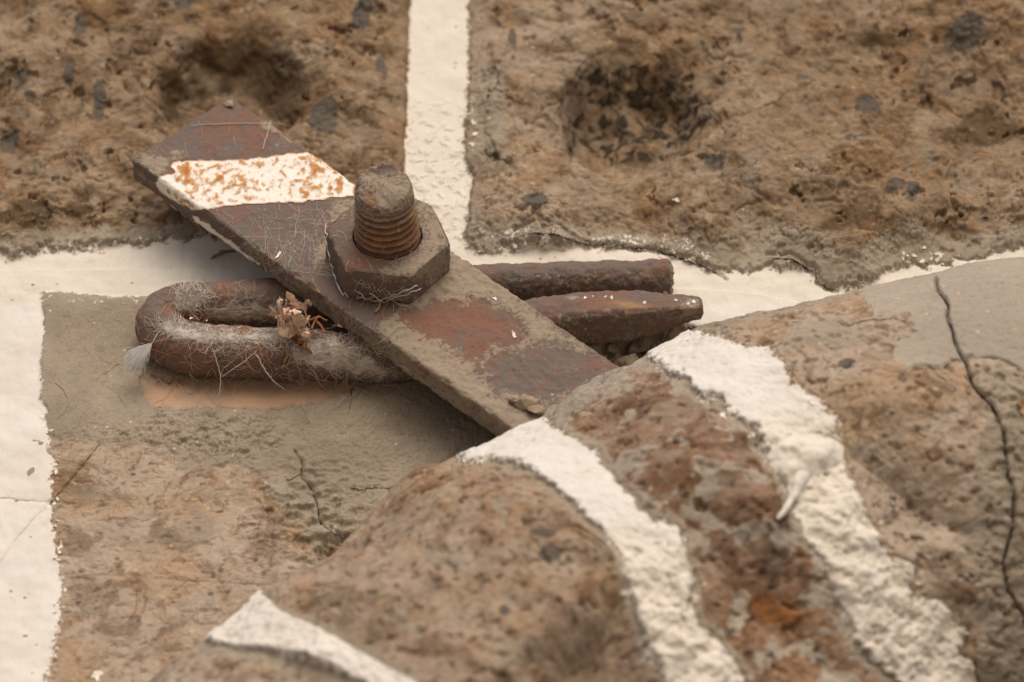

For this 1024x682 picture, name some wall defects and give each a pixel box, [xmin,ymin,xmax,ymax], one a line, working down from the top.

corrosion [167,154,344,208]
crack [912,284,1023,614]
crack [285,451,343,539]